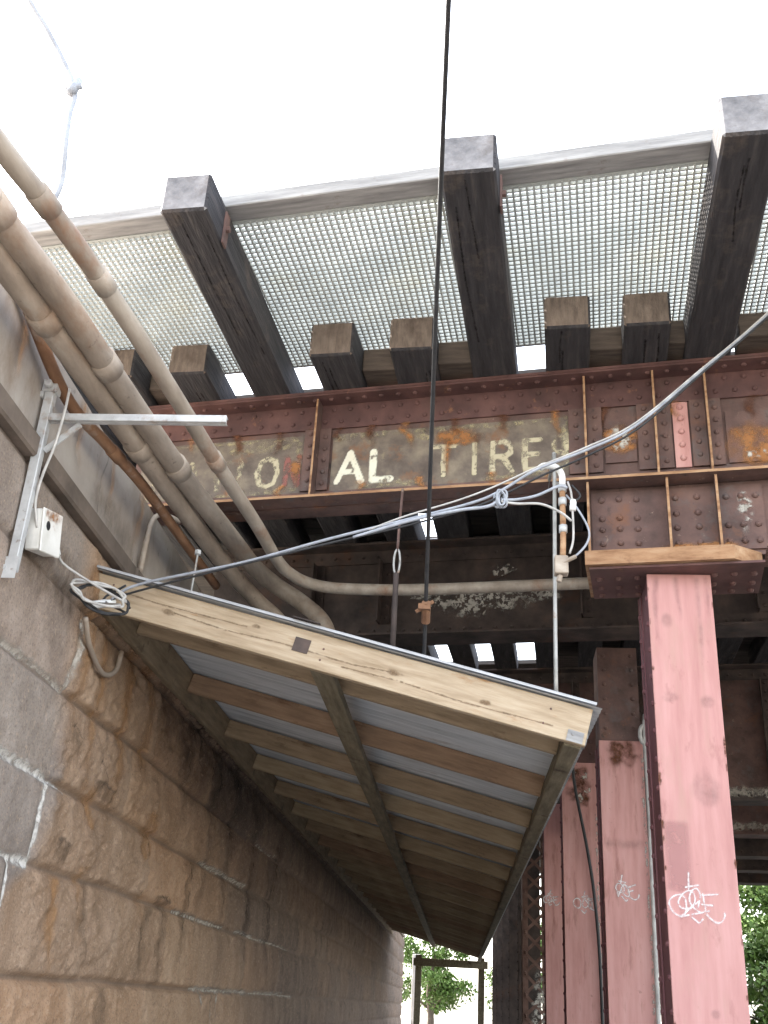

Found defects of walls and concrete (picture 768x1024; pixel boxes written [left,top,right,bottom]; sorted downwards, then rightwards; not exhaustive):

corrosion [438,418,474,461]
corrosion [601,407,635,452]
corrosion [733,427,768,464]
peeling [411,591,560,616]
corrosion [610,741,636,764]